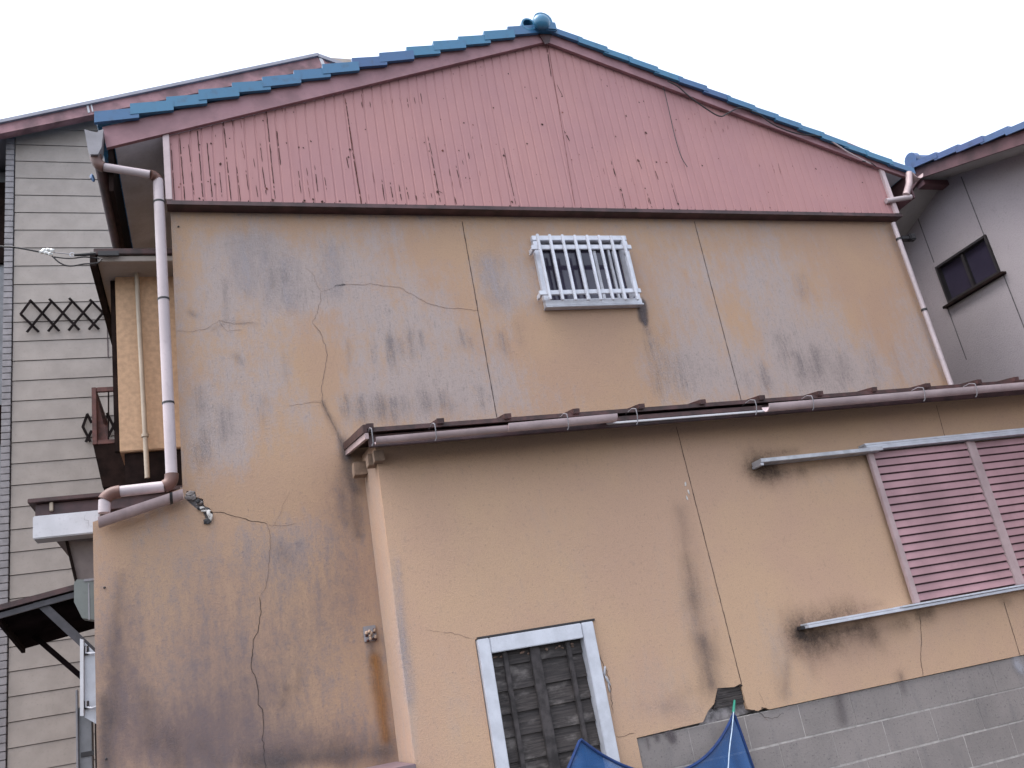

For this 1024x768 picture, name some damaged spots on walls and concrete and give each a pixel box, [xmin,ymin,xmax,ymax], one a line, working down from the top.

crack [291,277,477,440]
water stain [638,300,648,326]
crack [216,500,292,768]
spalling [698,684,763,725]